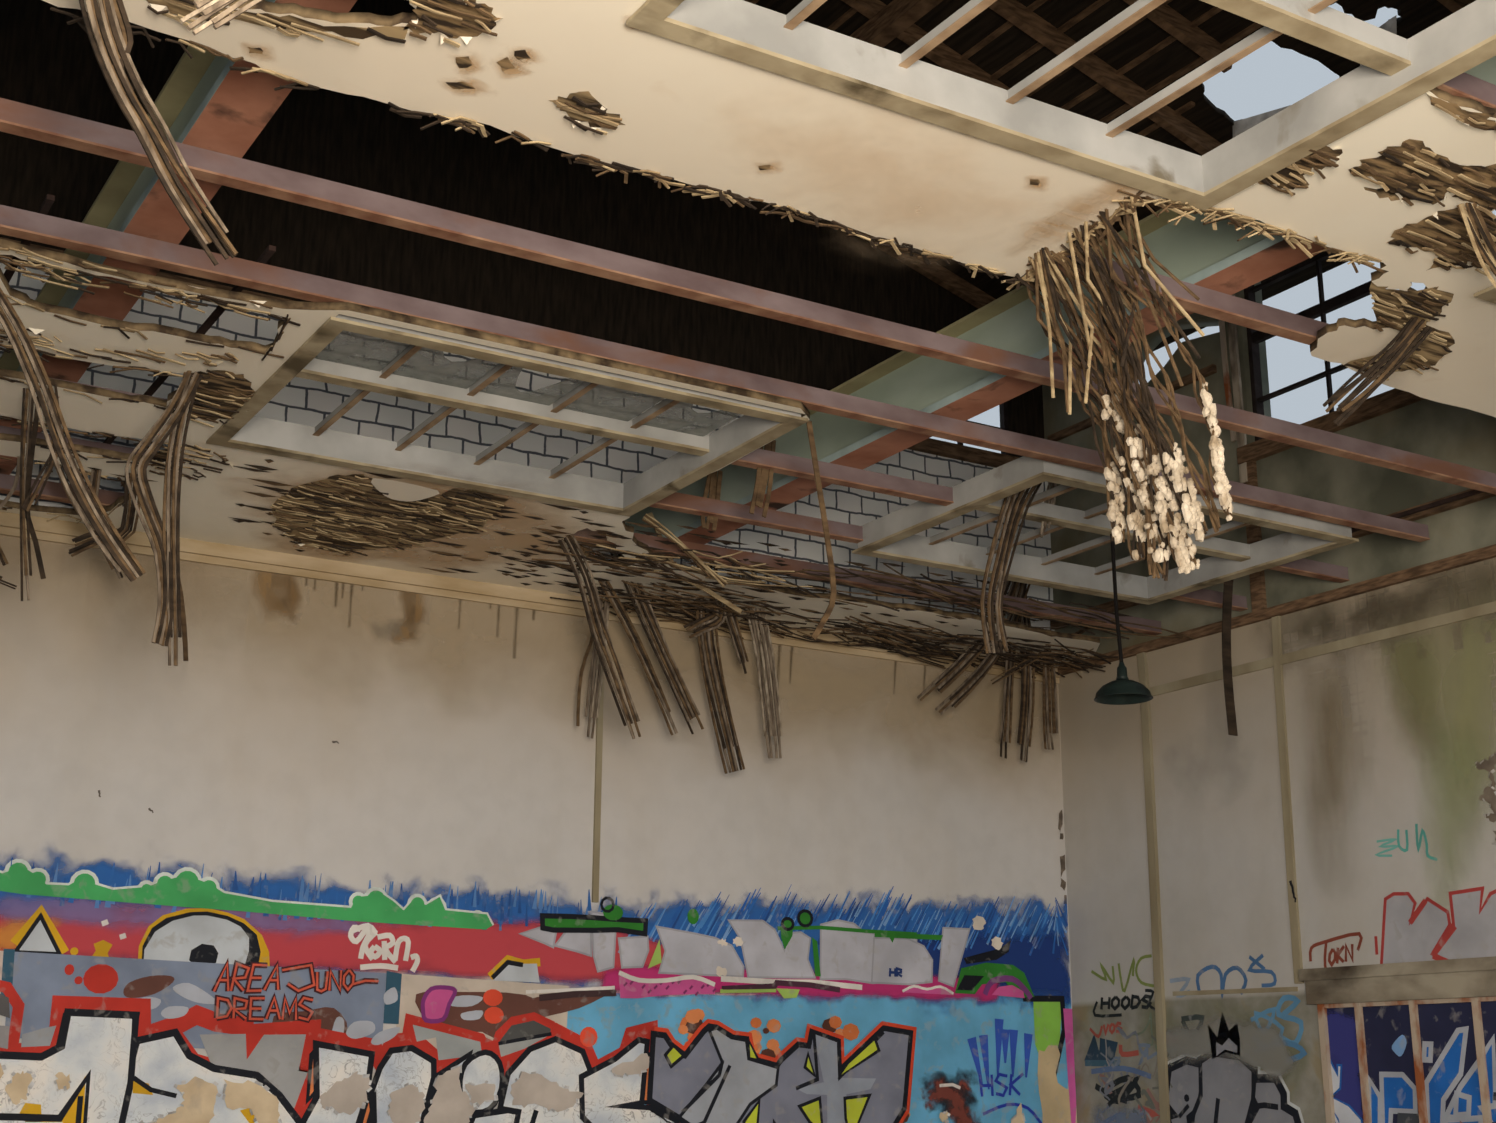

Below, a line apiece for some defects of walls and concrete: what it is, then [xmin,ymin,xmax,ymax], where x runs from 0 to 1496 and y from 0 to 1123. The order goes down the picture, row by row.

flaking render [130,0,503,92]
spalling [496,50,532,74]
flaking render [548,91,625,135]
flaking render [388,102,1496,381]
flaking render [0,247,301,428]
flaking render [0,417,1056,647]
damp [573,623,1043,741]
damp [1358,564,1496,785]
peeling [0,1063,36,1105]
peeling [139,1077,282,1123]
peeling [319,1071,372,1115]
peeling [387,1065,584,1123]